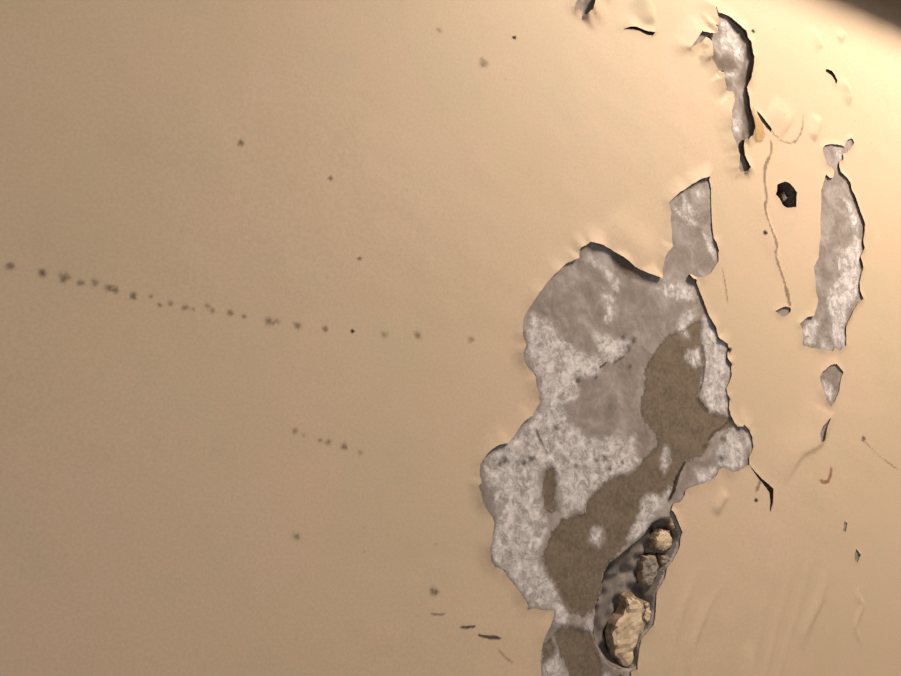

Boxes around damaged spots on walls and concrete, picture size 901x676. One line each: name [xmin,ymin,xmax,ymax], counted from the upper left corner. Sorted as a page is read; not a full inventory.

peeling [570,0,599,20]
peeling [686,0,756,179]
peeling [470,171,758,676]
peeling [774,135,867,445]